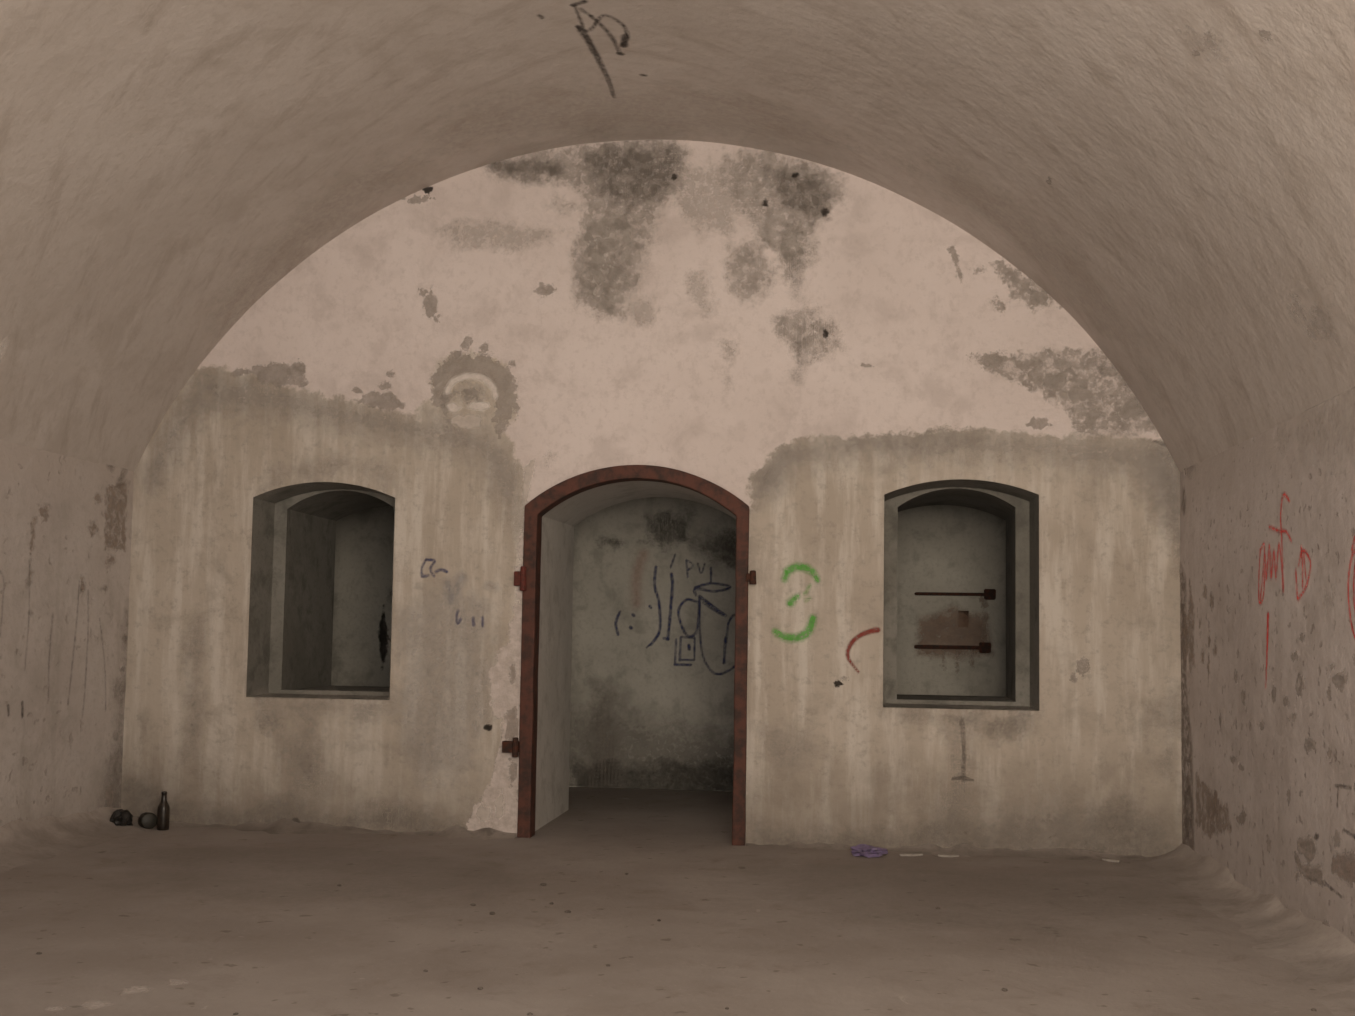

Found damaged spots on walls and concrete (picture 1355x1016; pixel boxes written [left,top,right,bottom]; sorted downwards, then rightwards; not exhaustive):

damp [487,139,843,325]
damp [774,310,839,381]
flaking render [971,347,1158,436]
flaking render [466,516,524,833]
flaking render [1180,565,1246,850]
flaking render [1295,829,1355,898]